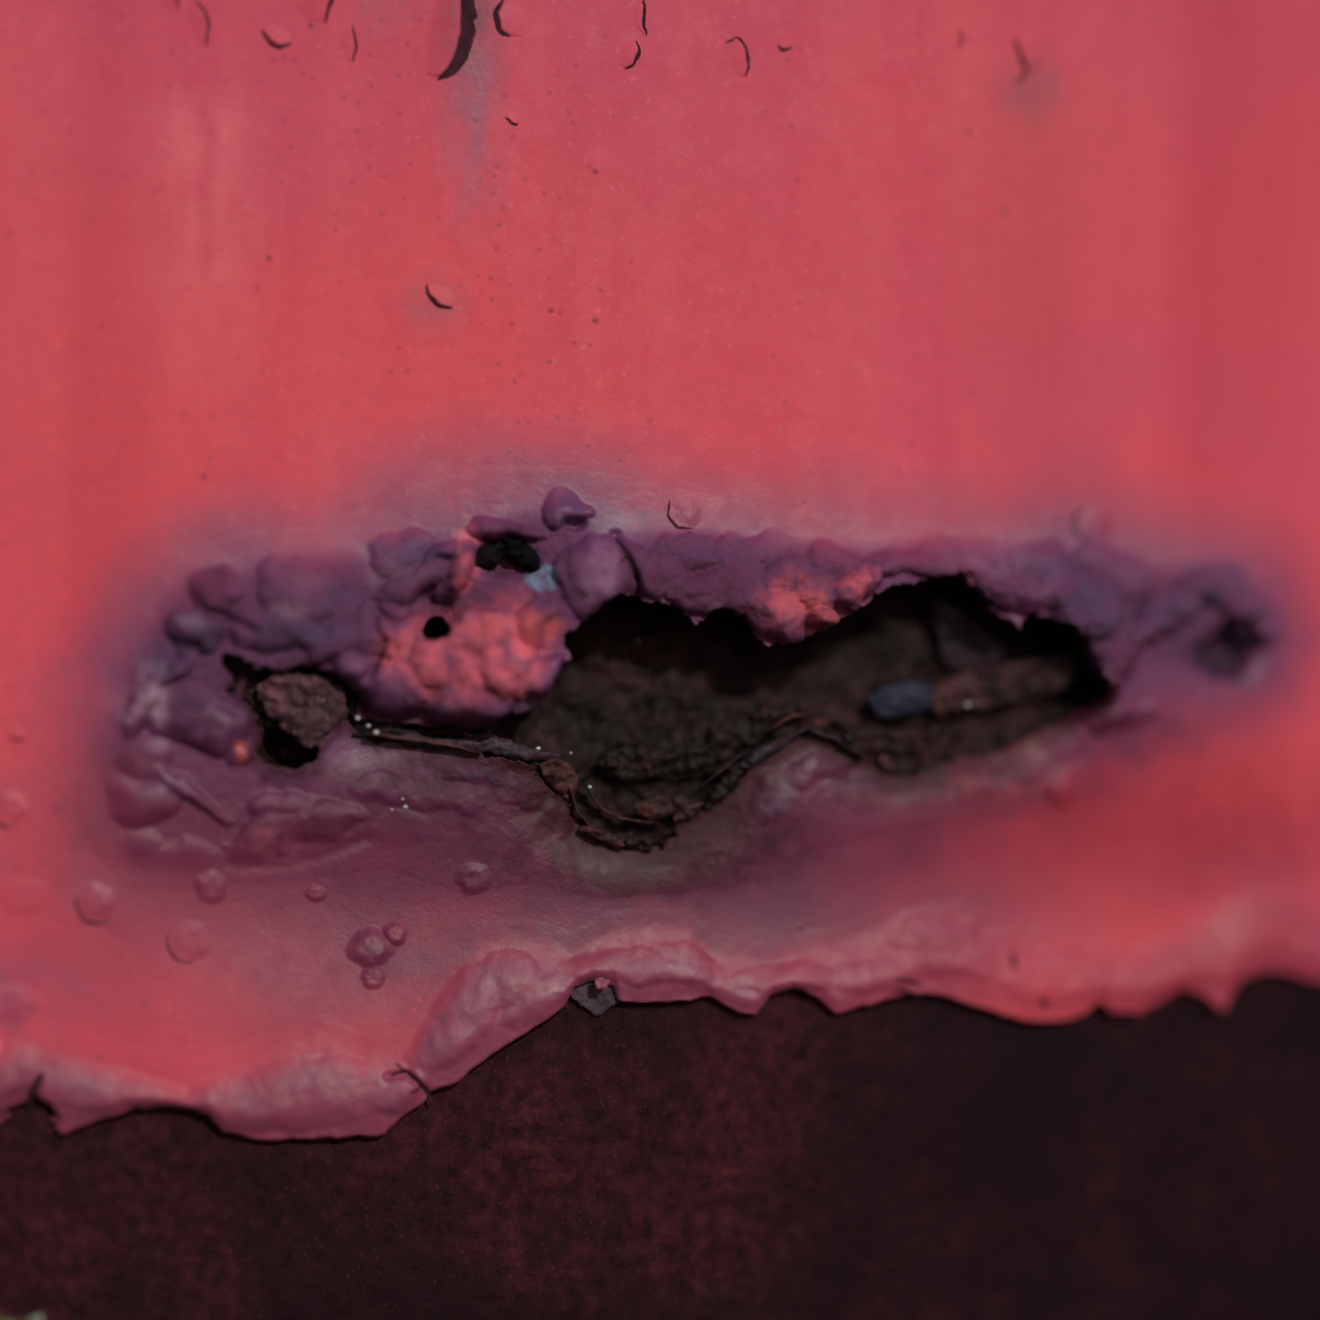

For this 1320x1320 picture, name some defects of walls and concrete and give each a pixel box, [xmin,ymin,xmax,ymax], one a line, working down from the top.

peeling [261,24,292,48]
peeling [426,0,529,80]
peeling [619,0,648,69]
peeling [722,37,750,77]
corrosion [400,731,776,823]
spalling [221,574,1105,850]
corrosion [804,719,969,772]
corrosion [578,824,654,852]
peeling [0,860,1320,1140]